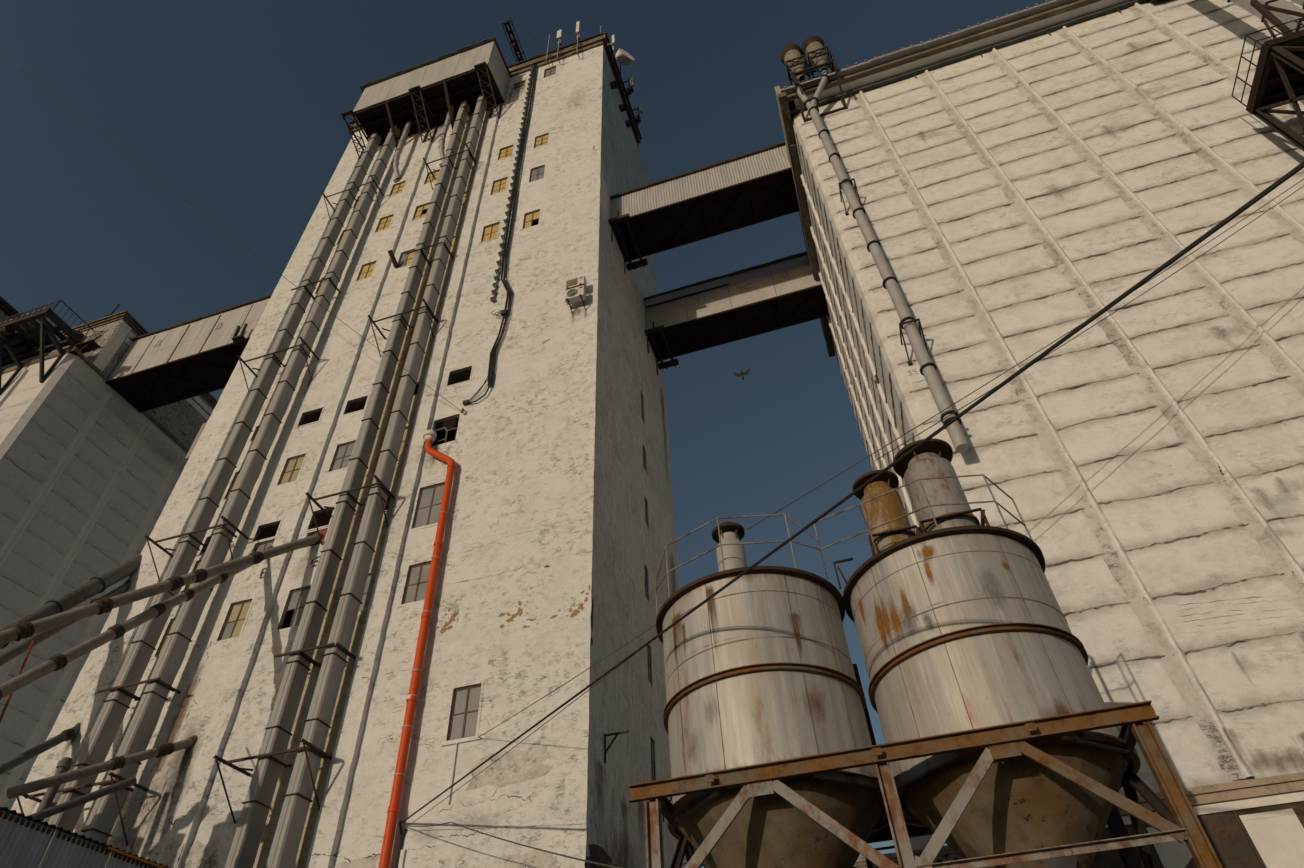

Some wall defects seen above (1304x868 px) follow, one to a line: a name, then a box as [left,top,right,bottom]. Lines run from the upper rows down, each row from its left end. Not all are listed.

rust [922,546,933,581]
peeling [434,603,464,642]
peeling [489,585,597,644]
rust [859,592,908,646]